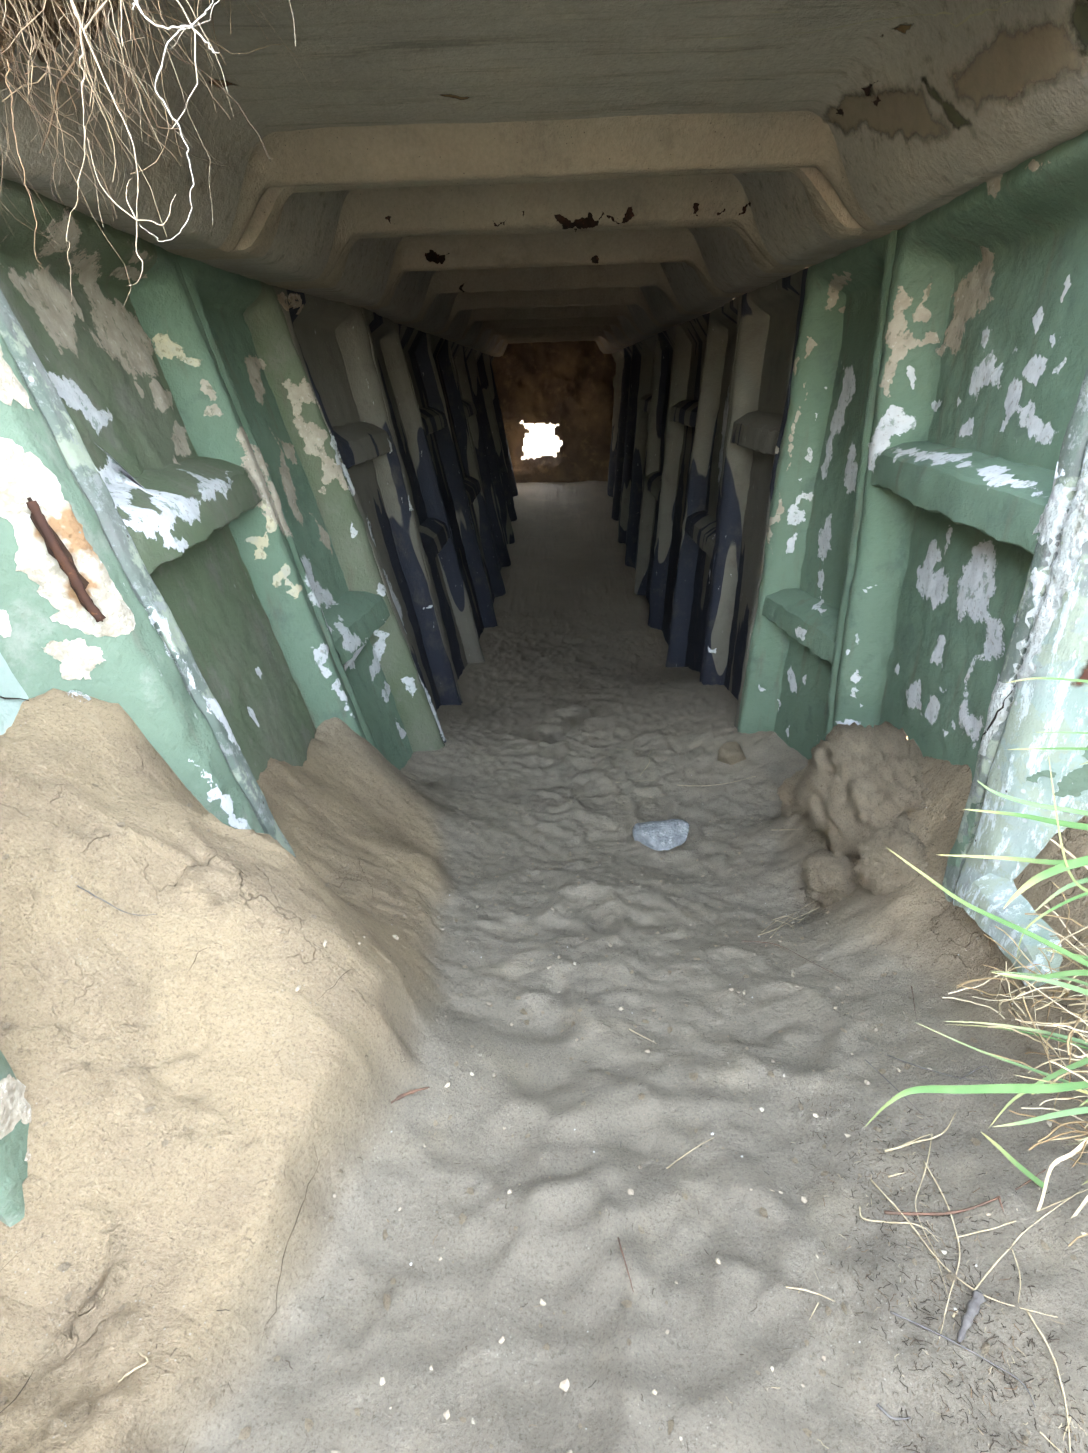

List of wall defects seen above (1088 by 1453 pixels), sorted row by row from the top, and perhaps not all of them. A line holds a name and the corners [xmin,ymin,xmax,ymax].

hole [554,207,634,232]
hole [693,201,751,216]
peeling [0,206,355,560]
peeling [350,516,376,547]
spalling [767,246,1088,757]
spalling [0,437,240,750]
peeling [272,555,446,741]
peeling [758,667,807,711]
peeling [188,759,251,829]
spalling [0,1074,32,1140]